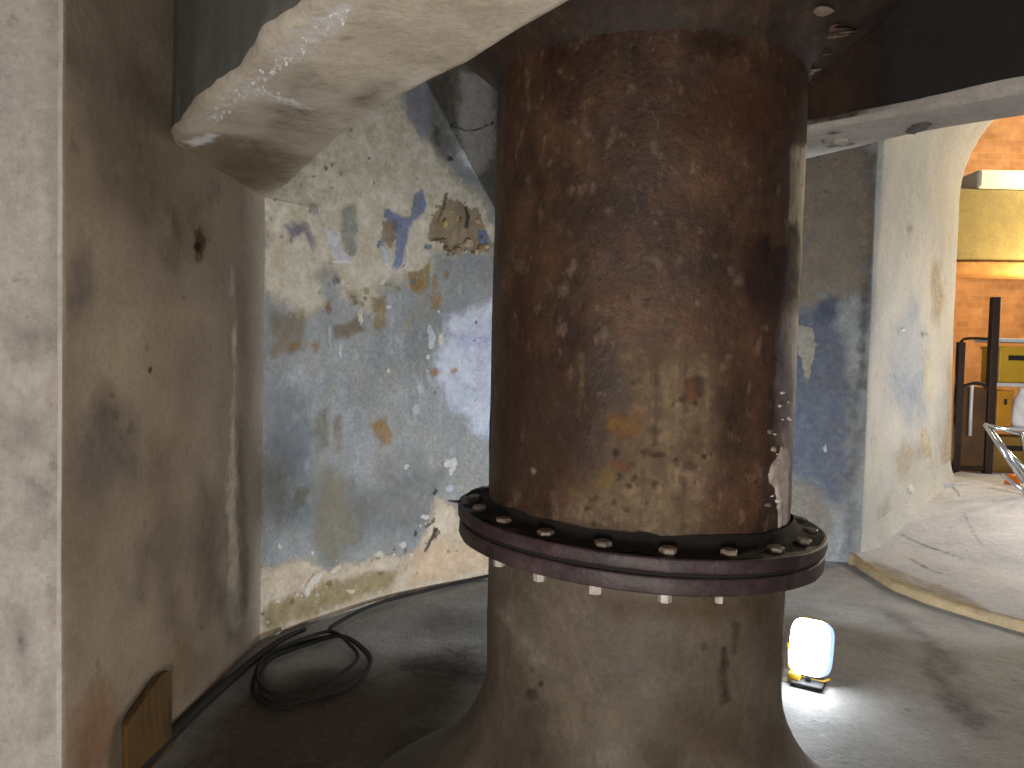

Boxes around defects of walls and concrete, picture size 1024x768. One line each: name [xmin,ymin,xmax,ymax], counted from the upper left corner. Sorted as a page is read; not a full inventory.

peeling [264,95,495,359]
peeling [765,324,828,532]
flaking render [260,456,489,639]